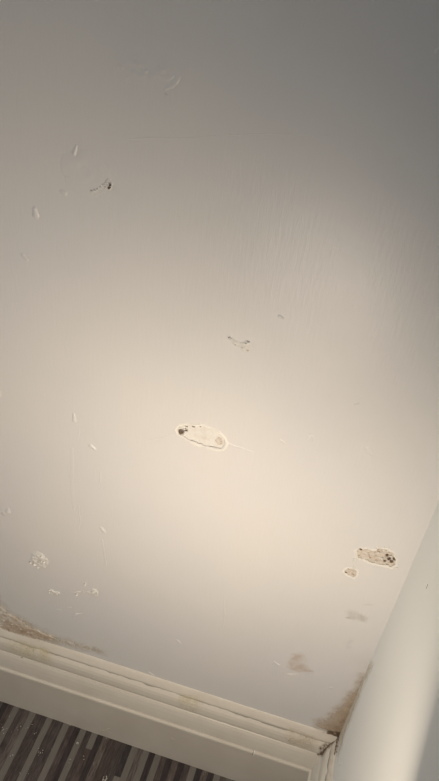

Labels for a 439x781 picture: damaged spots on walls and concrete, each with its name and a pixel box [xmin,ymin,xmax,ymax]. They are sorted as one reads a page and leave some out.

flaking render [174,423,229,451]
flaking render [342,546,398,579]
flaking render [0,605,54,641]
damp [317,690,358,755]